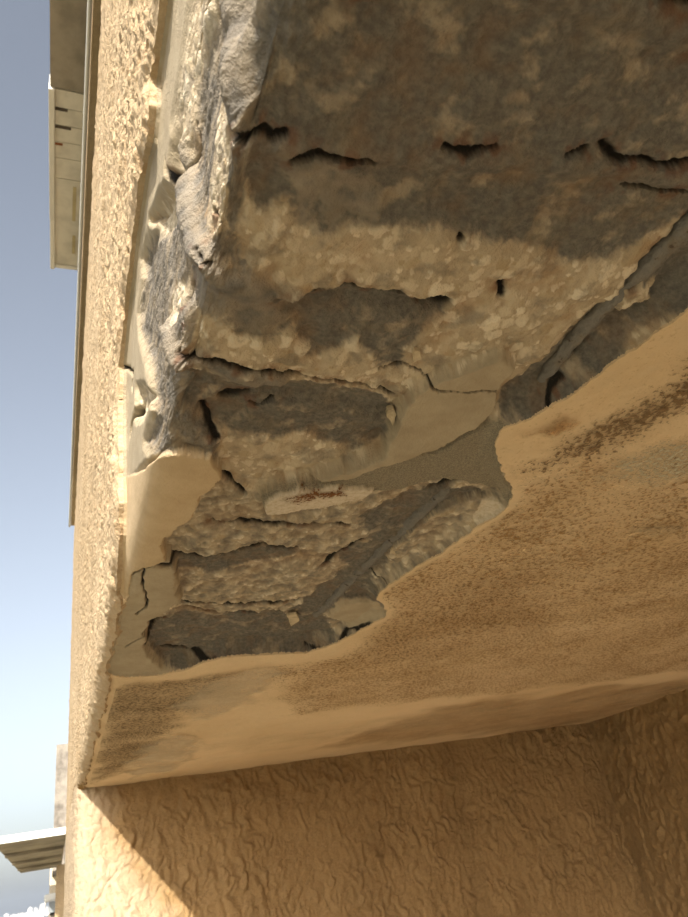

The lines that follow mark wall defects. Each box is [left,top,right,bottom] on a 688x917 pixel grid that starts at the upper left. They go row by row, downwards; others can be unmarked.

spalling [107,0,688,677]
crack [135,568,149,615]
rust [287,483,347,505]
damp [269,360,688,714]
damp [92,674,233,783]